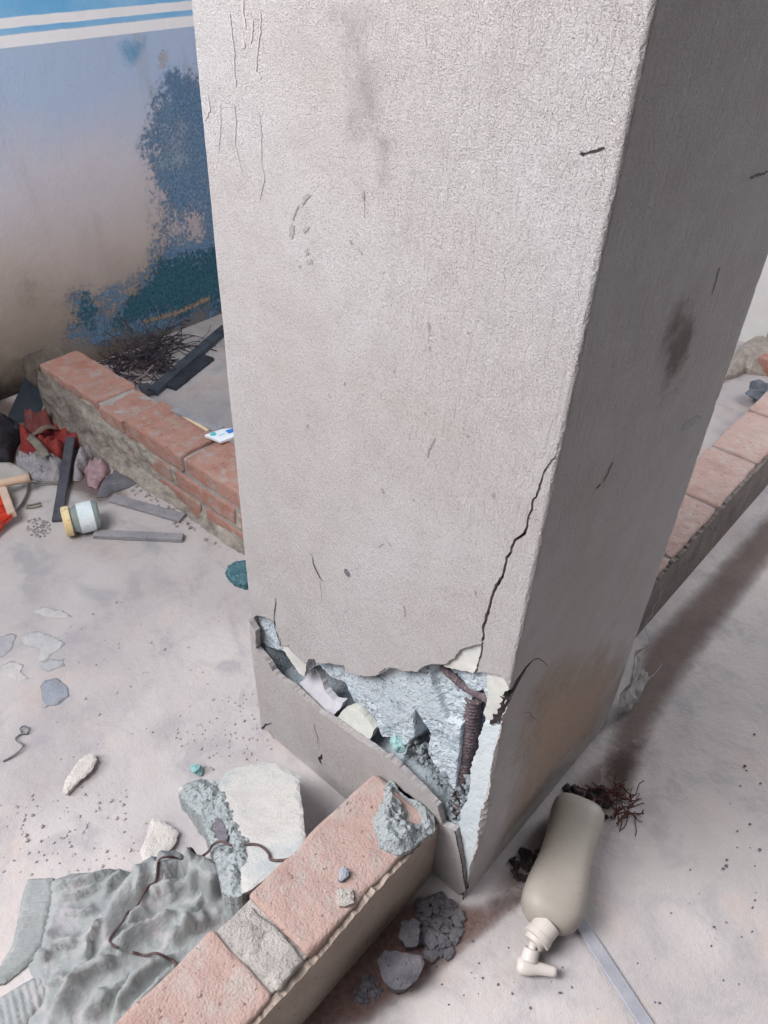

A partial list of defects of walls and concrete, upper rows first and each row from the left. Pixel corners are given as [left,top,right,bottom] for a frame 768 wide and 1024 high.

peeling [162,201,211,246]
peeling [143,295,210,324]
crack [475,456,555,672]
spalling [257,616,517,881]
spalling [336,866,354,908]